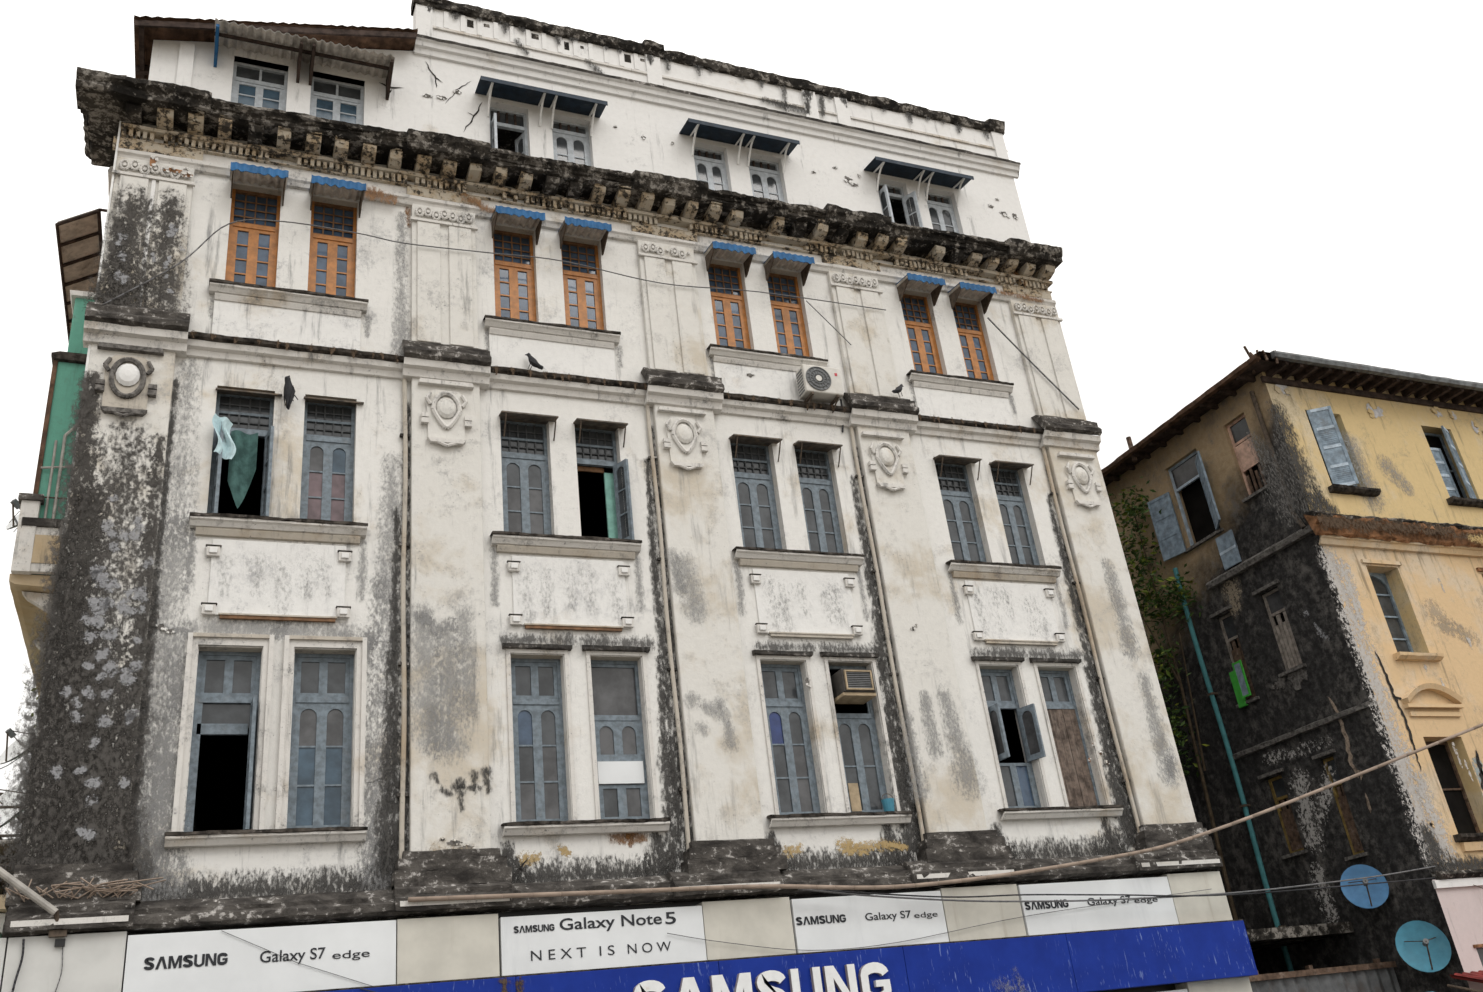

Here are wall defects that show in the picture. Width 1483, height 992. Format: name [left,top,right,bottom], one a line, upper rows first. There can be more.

crack [379,62,482,131]
damp [762,85,826,116]
damp [84,185,238,344]
damp [308,214,408,364]
damp [0,360,198,901]
damp [358,403,492,889]
damp [636,427,704,867]
damp [734,564,744,613]
damp [850,447,984,861]
damp [1221,580,1242,613]
damp [1263,737,1339,923]